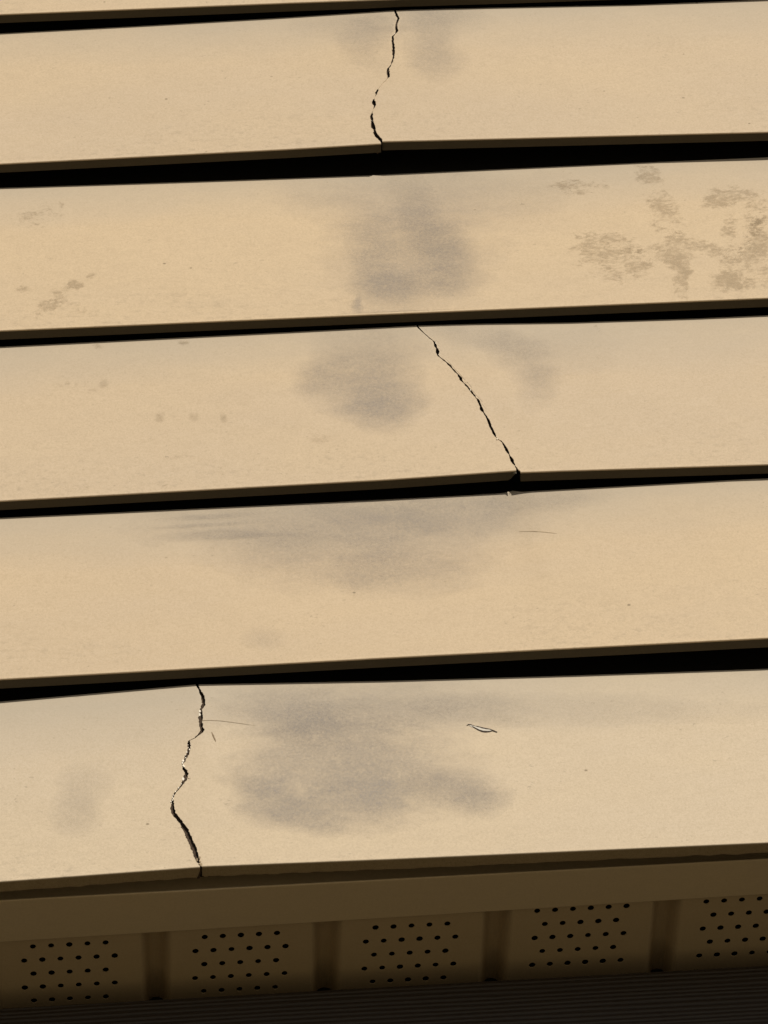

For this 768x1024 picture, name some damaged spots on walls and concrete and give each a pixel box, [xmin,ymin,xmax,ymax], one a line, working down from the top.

crack [370,14,399,154]
crack [434,342,519,471]
crack [170,688,249,878]